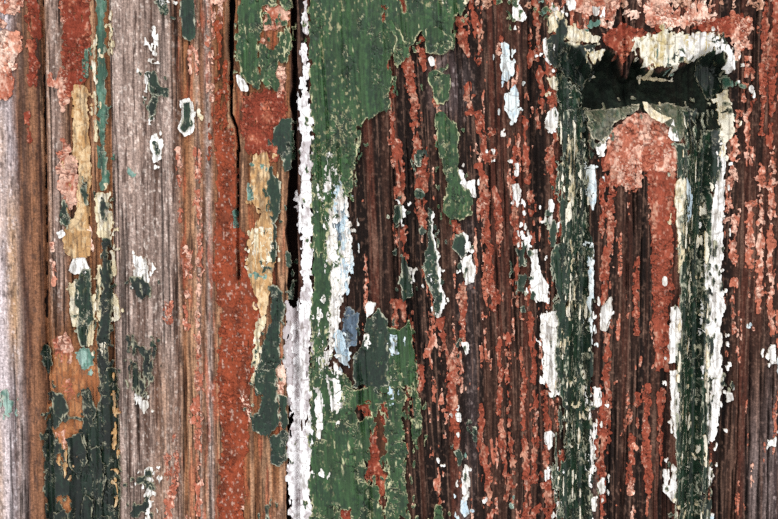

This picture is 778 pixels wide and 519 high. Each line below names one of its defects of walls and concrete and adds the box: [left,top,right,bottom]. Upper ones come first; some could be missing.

peeling [0,0,92,113]
peeling [39,138,181,519]
peeling [136,26,169,125]
peeling [150,130,164,169]
crack [229,0,241,228]
peeling [154,0,506,519]
peeling [493,0,778,519]